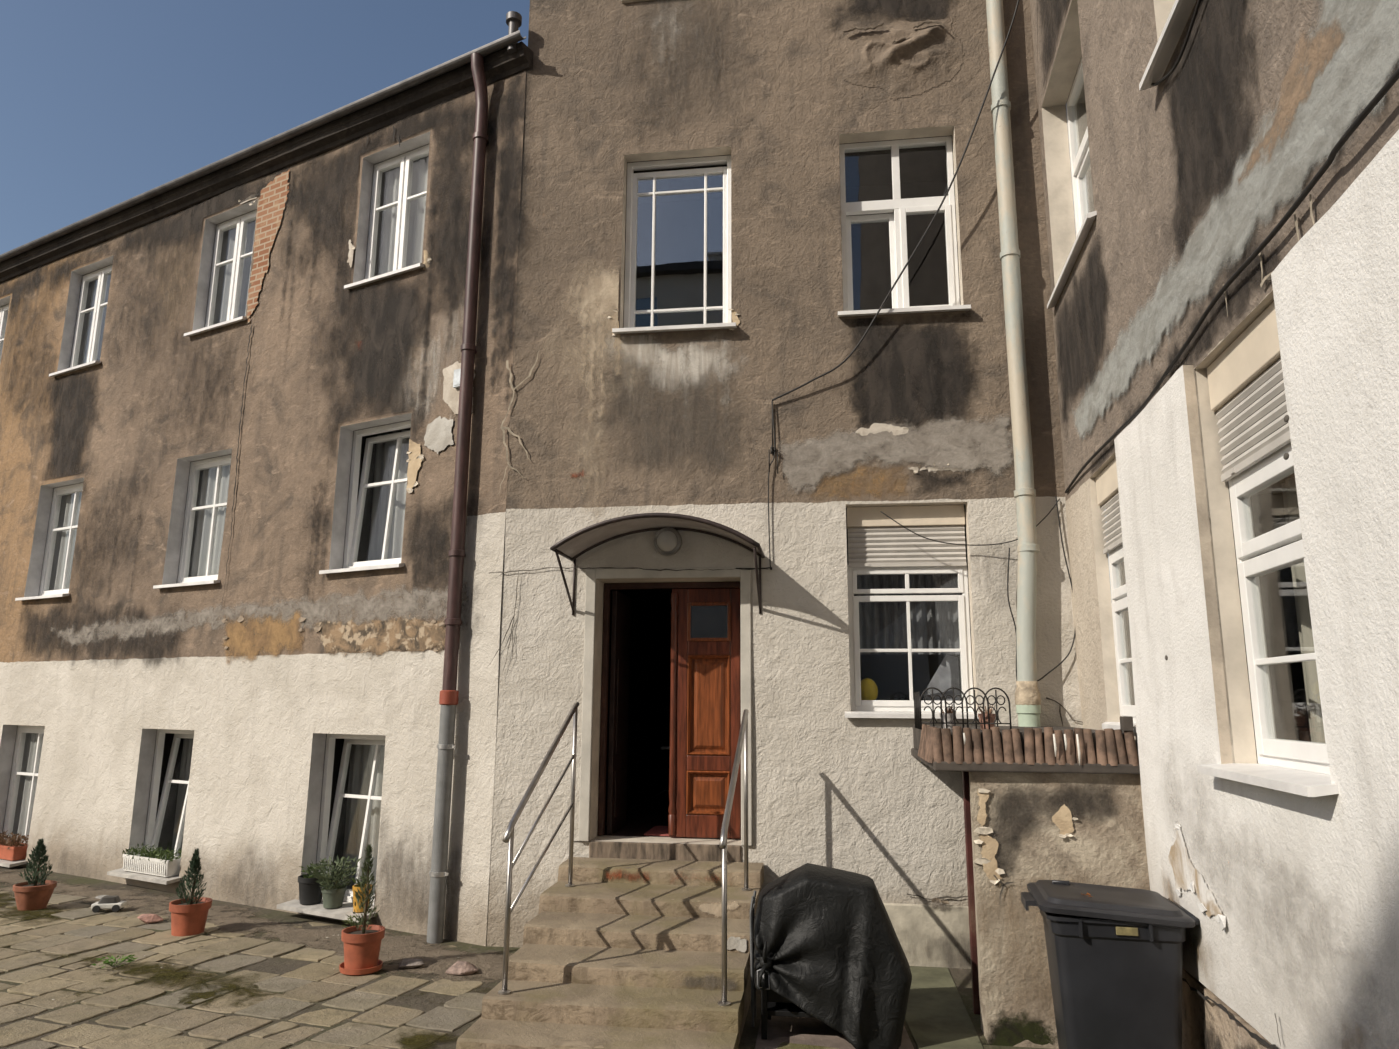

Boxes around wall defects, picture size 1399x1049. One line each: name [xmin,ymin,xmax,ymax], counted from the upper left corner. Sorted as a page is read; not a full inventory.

flaking render [238,170,290,323]
leakage [419,318,435,420]
leakage [569,270,738,470]
crack [498,349,540,494]
flaking render [856,423,909,436]
flaking render [908,463,963,474]
flaking render [221,612,446,662]
flaking render [974,789,1005,885]
flaking render [1052,804,1078,839]
peeling [1168,823,1226,931]
leakage [1201,1028,1255,1049]